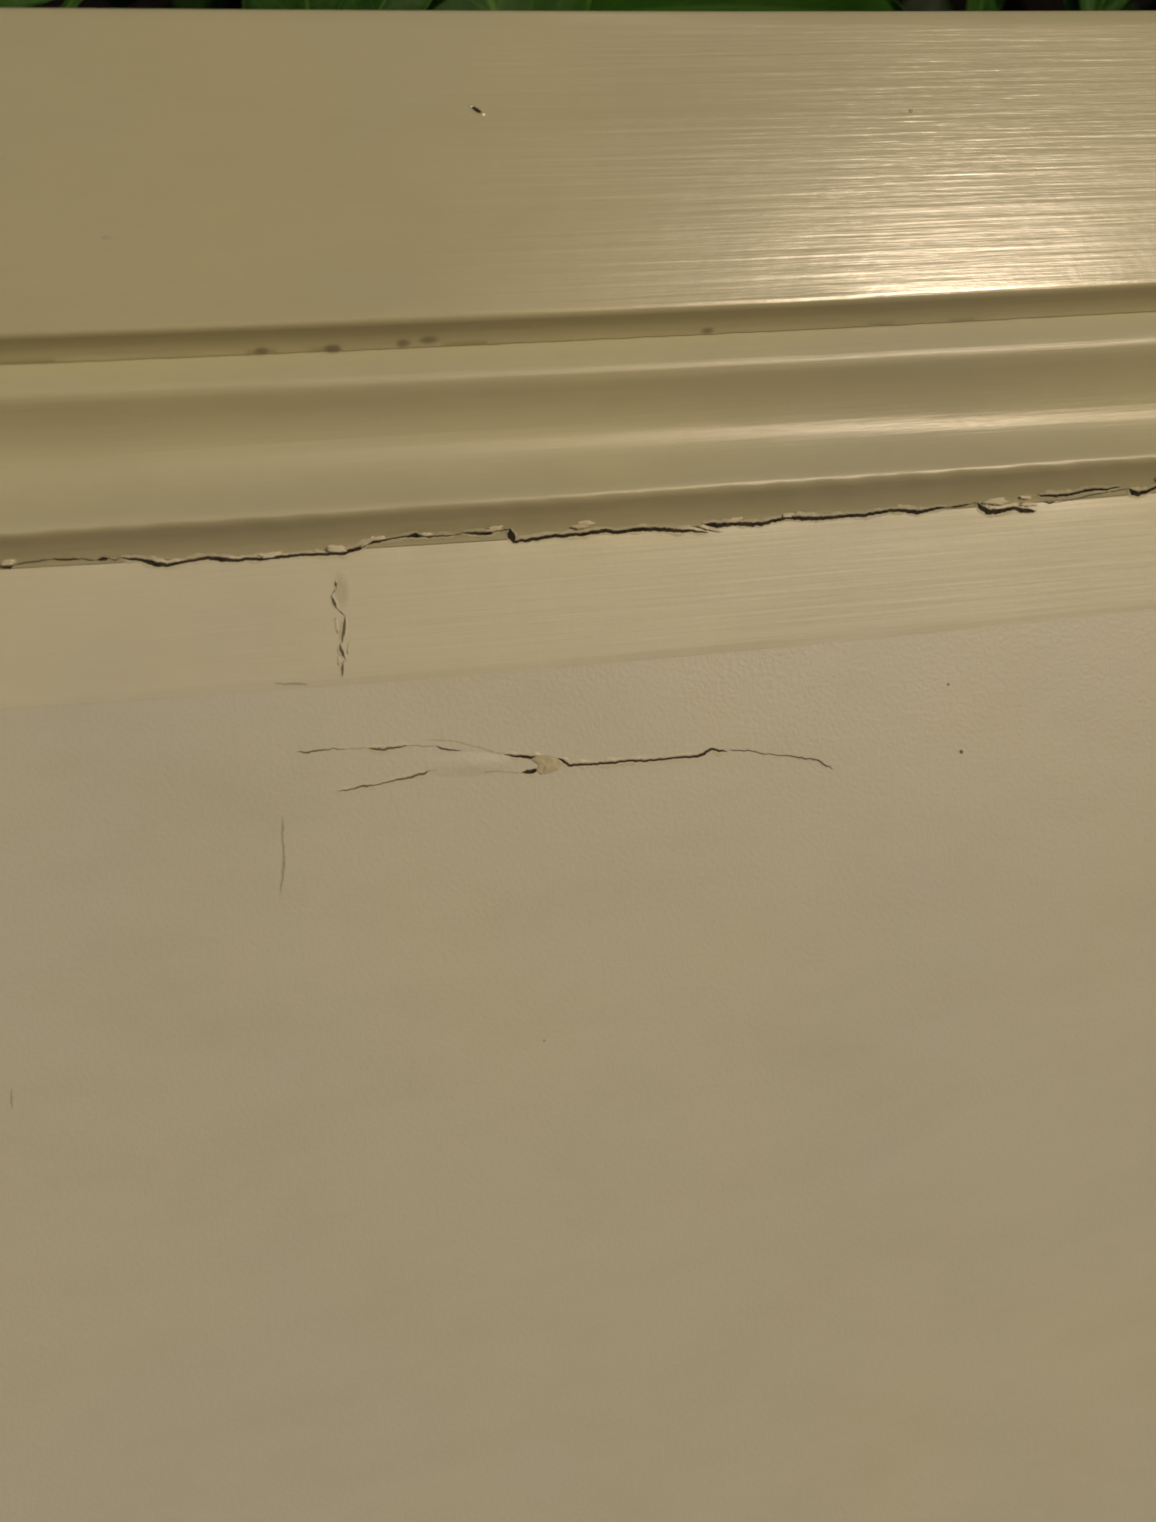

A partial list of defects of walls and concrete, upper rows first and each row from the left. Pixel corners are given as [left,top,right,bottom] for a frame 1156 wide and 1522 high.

crack [0,483,1156,685]
crack [296,740,834,793]